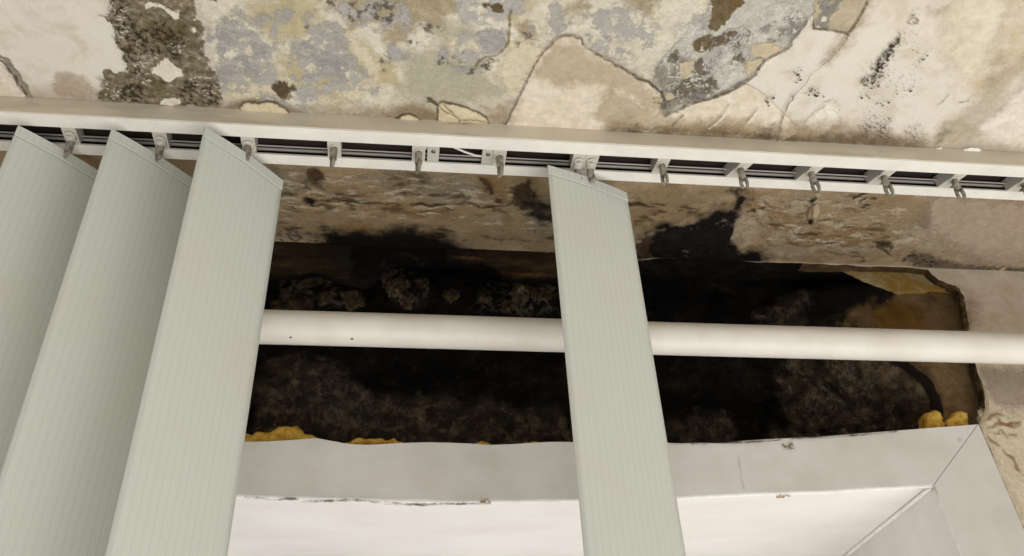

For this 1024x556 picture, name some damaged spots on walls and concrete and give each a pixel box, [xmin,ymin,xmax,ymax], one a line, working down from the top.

damp [482,3,504,13]
crack [505,13,813,125]
damp [760,14,929,146]
spalling [264,256,562,319]
damp [269,165,558,285]
spalling [635,196,969,331]
spalling [246,337,573,445]
spalling [653,355,985,443]